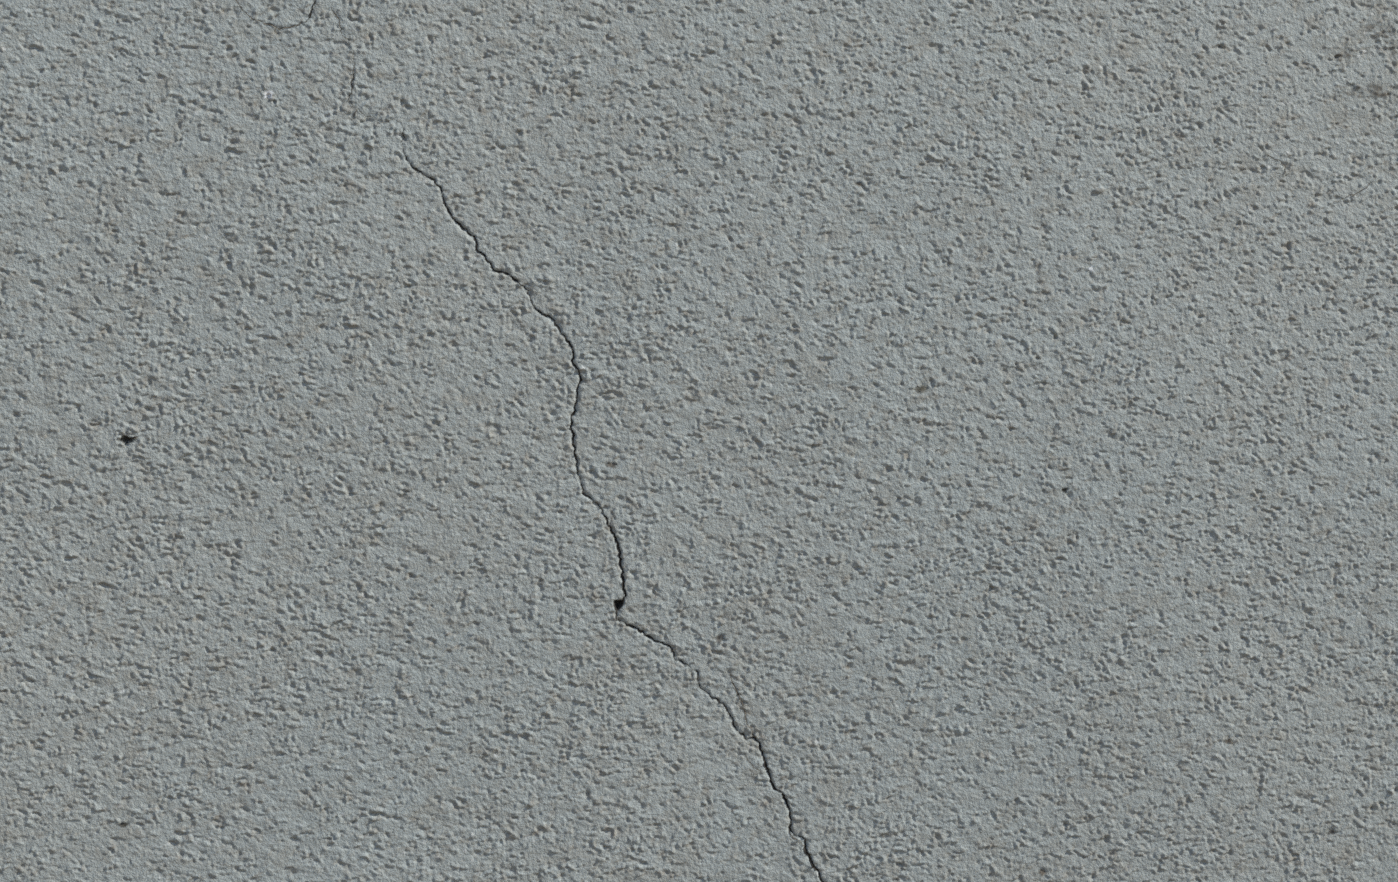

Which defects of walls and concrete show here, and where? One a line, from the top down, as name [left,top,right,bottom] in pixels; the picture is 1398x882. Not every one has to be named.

crack [237,2,824,882]